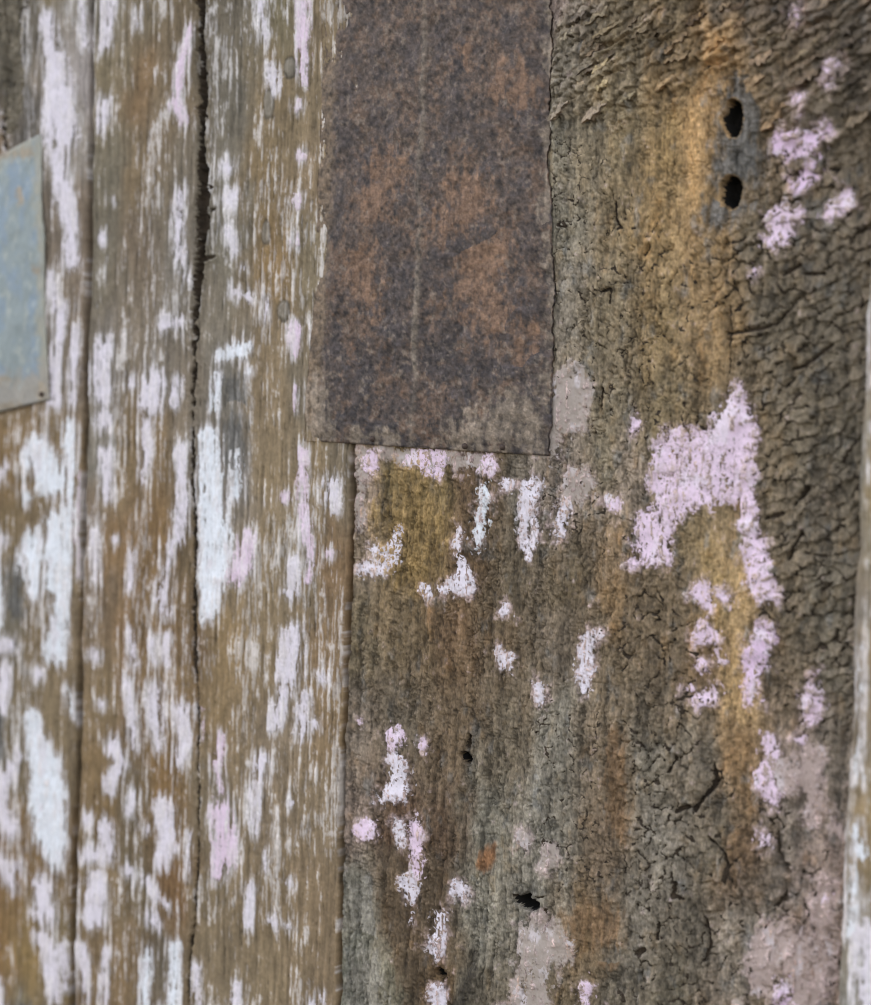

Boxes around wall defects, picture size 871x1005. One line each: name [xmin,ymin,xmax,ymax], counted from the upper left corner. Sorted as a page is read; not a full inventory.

peeling [0,0,185,684]
peeling [0,707,192,1005]
peeling [102,626,205,818]
peeling [138,939,203,1005]
crack [187,0,216,996]
peeling [153,339,257,627]
peeling [206,728,270,888]
peeling [267,444,343,746]
peeling [351,720,430,923]
rust [305,0,555,610]
peeling [354,358,624,601]
peeling [624,377,784,607]